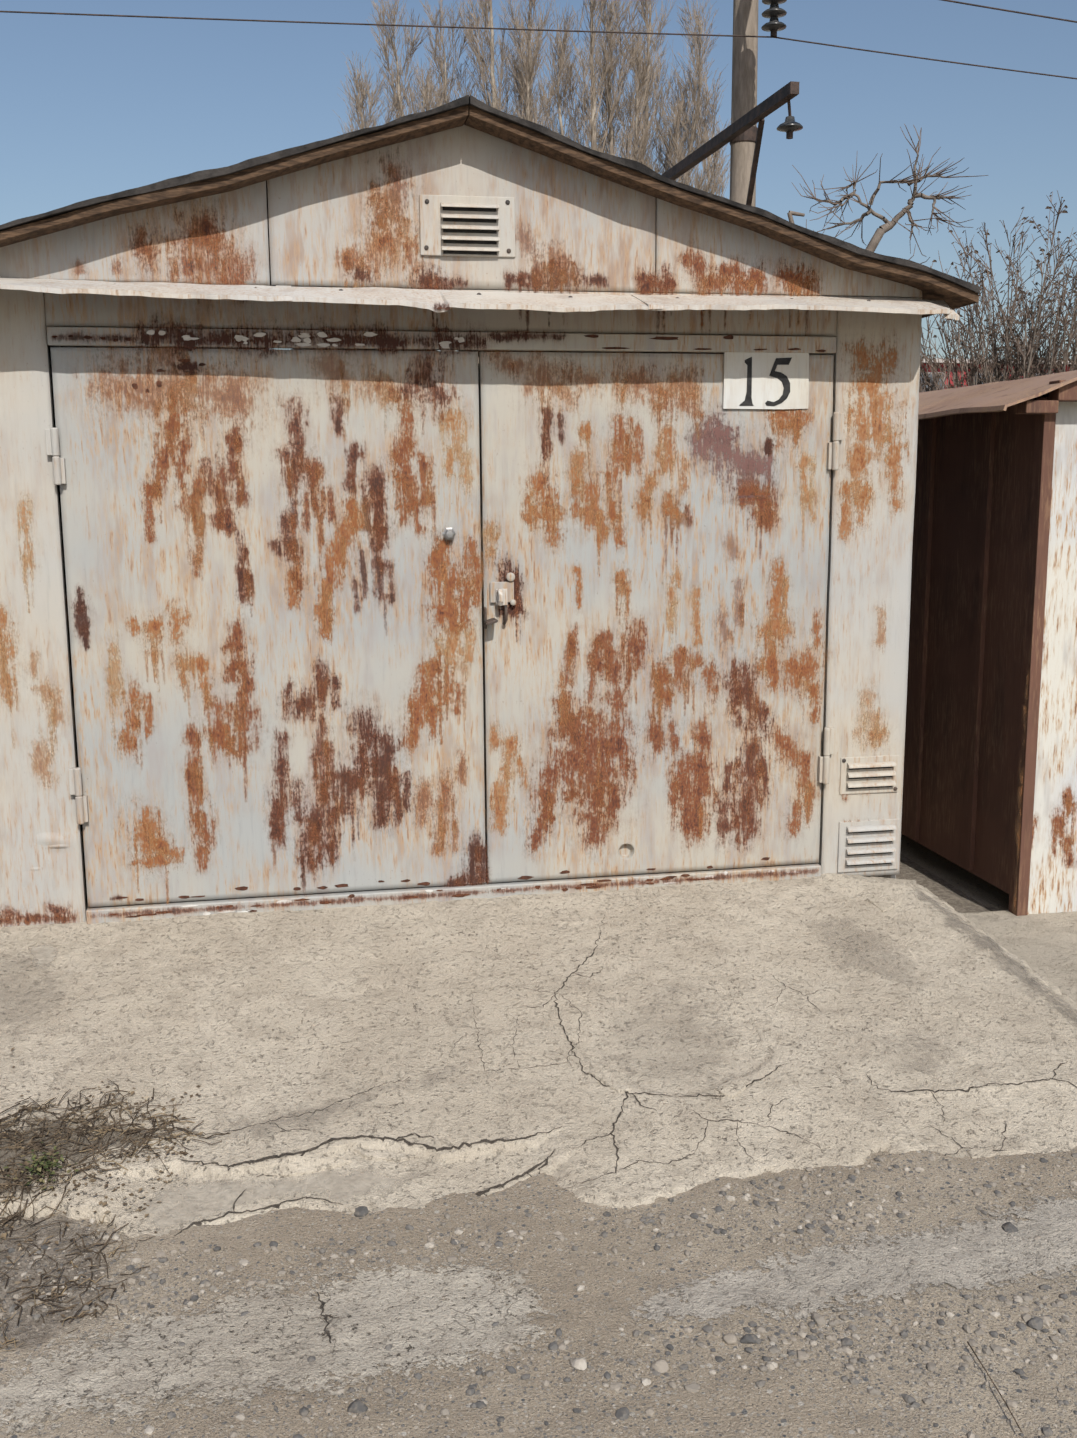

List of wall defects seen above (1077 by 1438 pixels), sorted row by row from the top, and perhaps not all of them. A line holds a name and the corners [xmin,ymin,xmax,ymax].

corrosion [112,211,256,303]
corrosion [336,152,468,330]
corrosion [504,225,609,293]
corrosion [635,249,820,335]
corrosion [838,334,909,540]
corrosion [18,500,35,580]
corrosion [0,605,62,727]
corrosion [76,347,827,918]
corrosion [854,691,888,746]
corrosion [0,903,76,926]
crack [175,918,821,1236]
crack [866,1062,1077,1156]